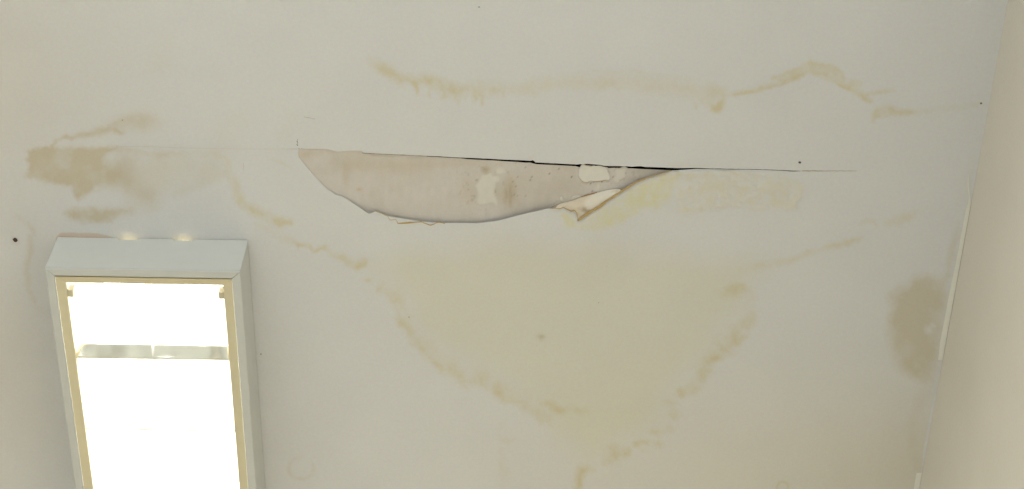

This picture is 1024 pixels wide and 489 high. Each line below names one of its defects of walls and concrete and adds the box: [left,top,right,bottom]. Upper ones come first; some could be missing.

damp [363,52,986,126]
peeling [299,149,674,226]
crack [365,153,709,170]
damp [555,173,674,234]
damp [21,108,603,432]
damp [569,234,868,489]
damp [880,217,962,473]